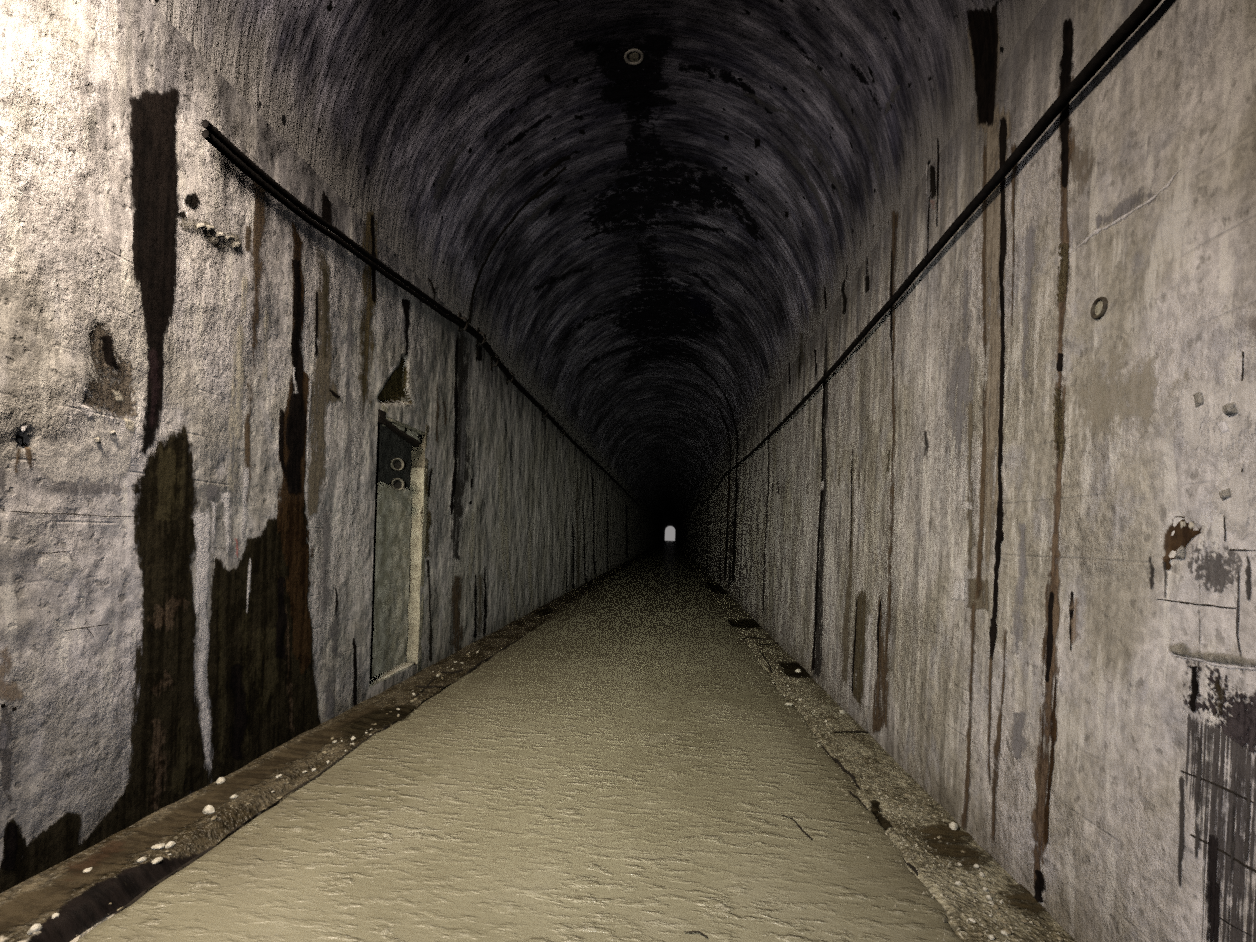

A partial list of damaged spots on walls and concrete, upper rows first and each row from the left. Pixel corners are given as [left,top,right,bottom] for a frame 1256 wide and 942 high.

peeling [0,322,138,494]
water stain [0,87,417,937]
water stain [680,221,727,233]
water stain [912,6,1035,871]
rust [1031,18,1077,902]
water stain [1178,514,1256,942]